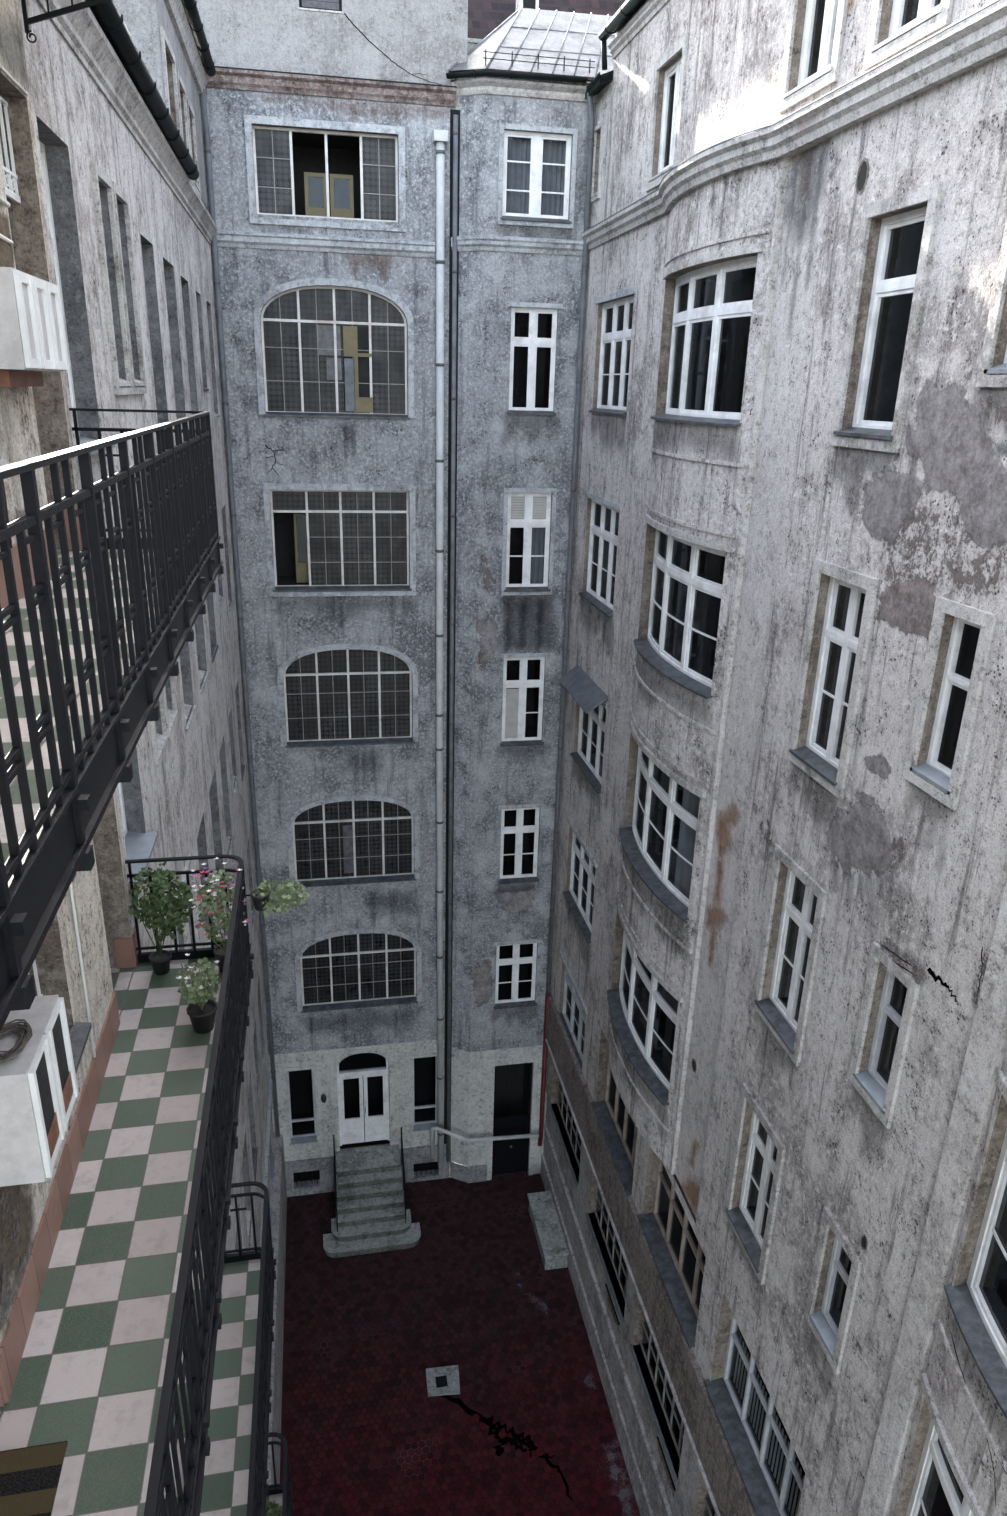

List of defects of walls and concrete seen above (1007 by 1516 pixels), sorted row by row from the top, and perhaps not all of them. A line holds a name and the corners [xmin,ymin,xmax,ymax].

crack [441,1395,574,1501]